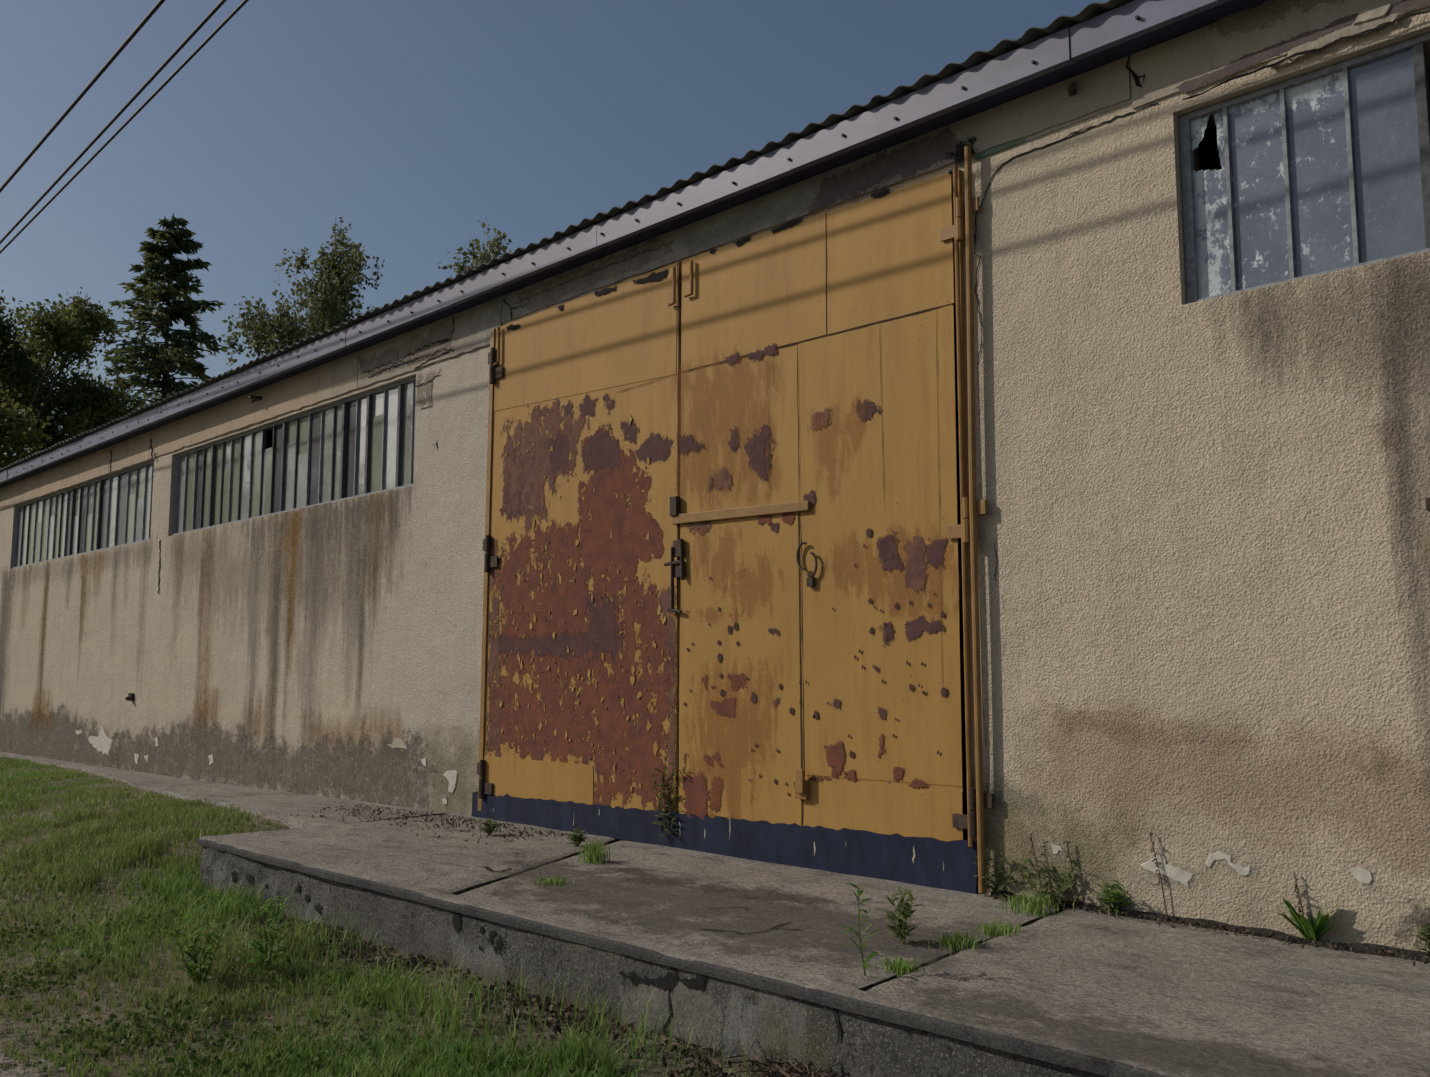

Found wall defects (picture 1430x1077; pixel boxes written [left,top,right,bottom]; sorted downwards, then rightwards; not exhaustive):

spalling [1176,0,1430,100]
crack [974,57,1159,365]
rust [856,399,881,422]
rust [485,393,856,820]
rust [863,528,947,647]
flaking render [0,704,458,808]
rust [877,707,897,762]
rust [893,767,927,789]
flaking render [1140,851,1252,888]
spalling [619,969,723,1052]